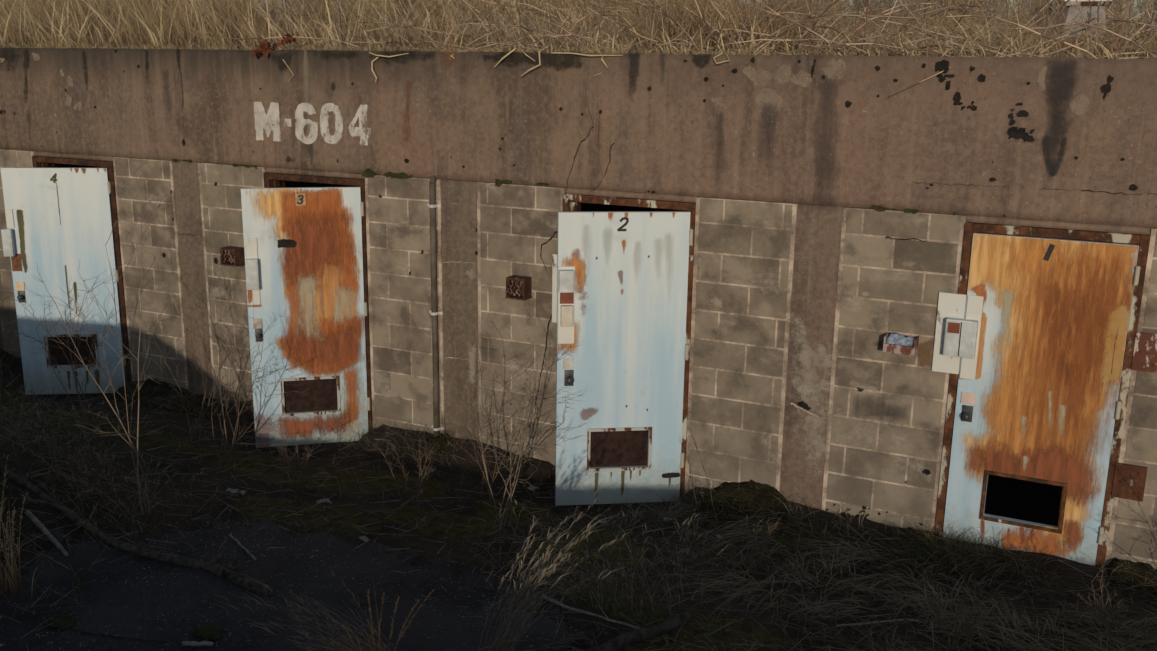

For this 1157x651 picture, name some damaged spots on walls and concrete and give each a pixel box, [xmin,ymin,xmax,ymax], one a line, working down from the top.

water stain [1043,62,1074,175]
corrosion [256,188,365,439]
corrosion [557,324,577,352]
corrosion [563,256,584,290]
corrosion [959,234,1139,556]